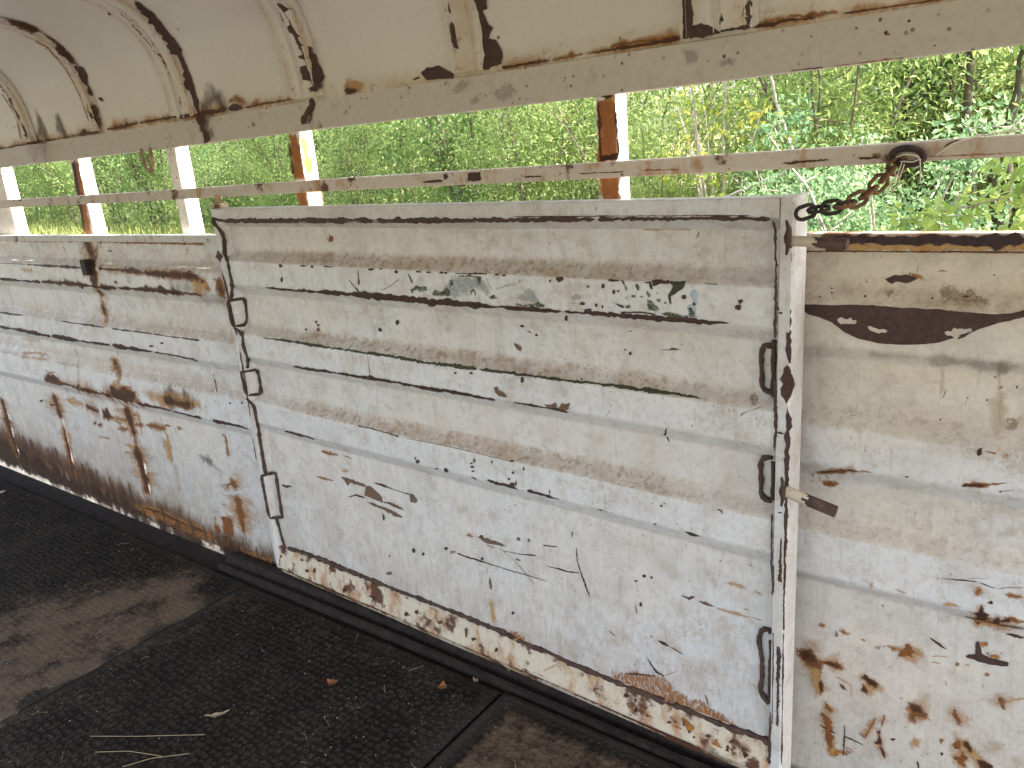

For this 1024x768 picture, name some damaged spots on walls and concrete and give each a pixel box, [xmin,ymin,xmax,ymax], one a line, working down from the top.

peeling [108,1,199,112]
peeling [277,3,325,125]
rust [507,33,680,68]
rust [753,0,939,28]
rust [0,92,291,150]
rust [580,95,624,199]
peeling [266,264,730,332]
rust [806,243,1024,253]
rust [0,358,418,624]
peeling [341,470,417,521]
peeling [767,221,1024,765]
rust [797,649,880,755]